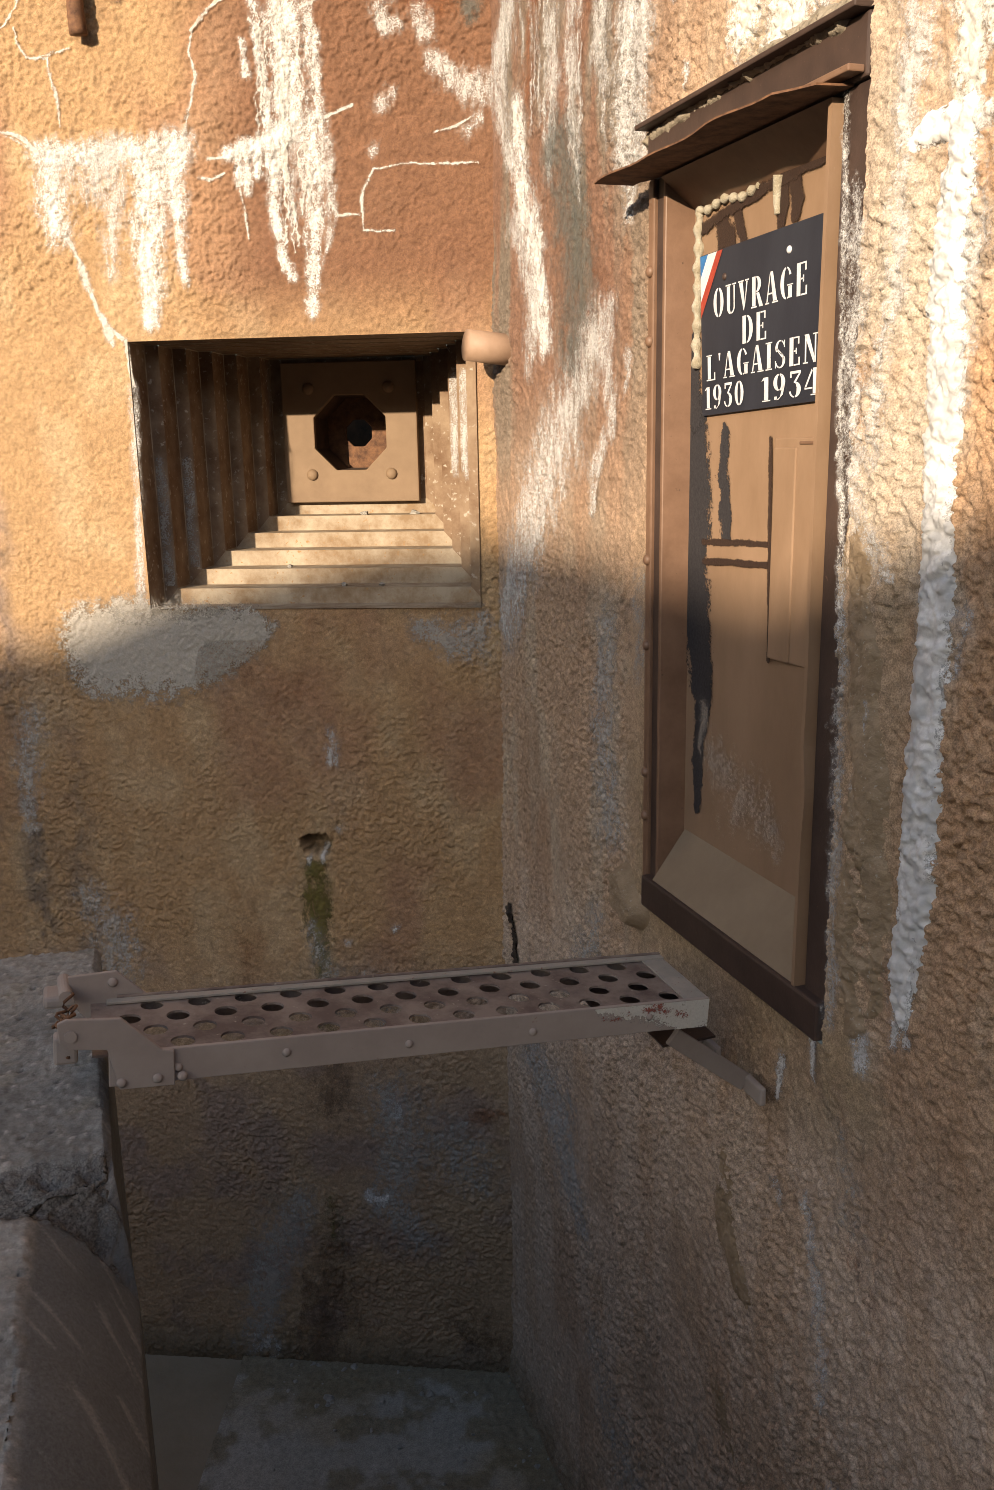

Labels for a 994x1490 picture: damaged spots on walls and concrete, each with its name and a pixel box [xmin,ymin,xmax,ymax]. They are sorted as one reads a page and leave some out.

peeling [57,457,279,705]
water stain [301,828,349,979]
spalling [0,1150,120,1274]